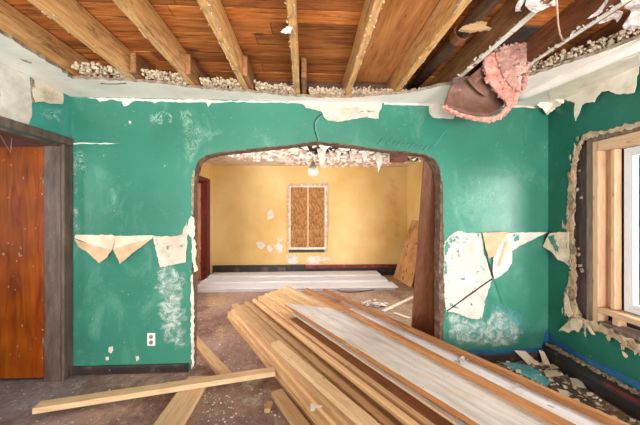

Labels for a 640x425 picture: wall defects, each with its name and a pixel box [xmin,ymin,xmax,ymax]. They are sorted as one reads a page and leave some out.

peeling [0,62,64,125]
peeling [79,97,455,122]
peeling [513,39,640,121]
flaking render [158,112,521,369]
flaking render [543,121,640,358]